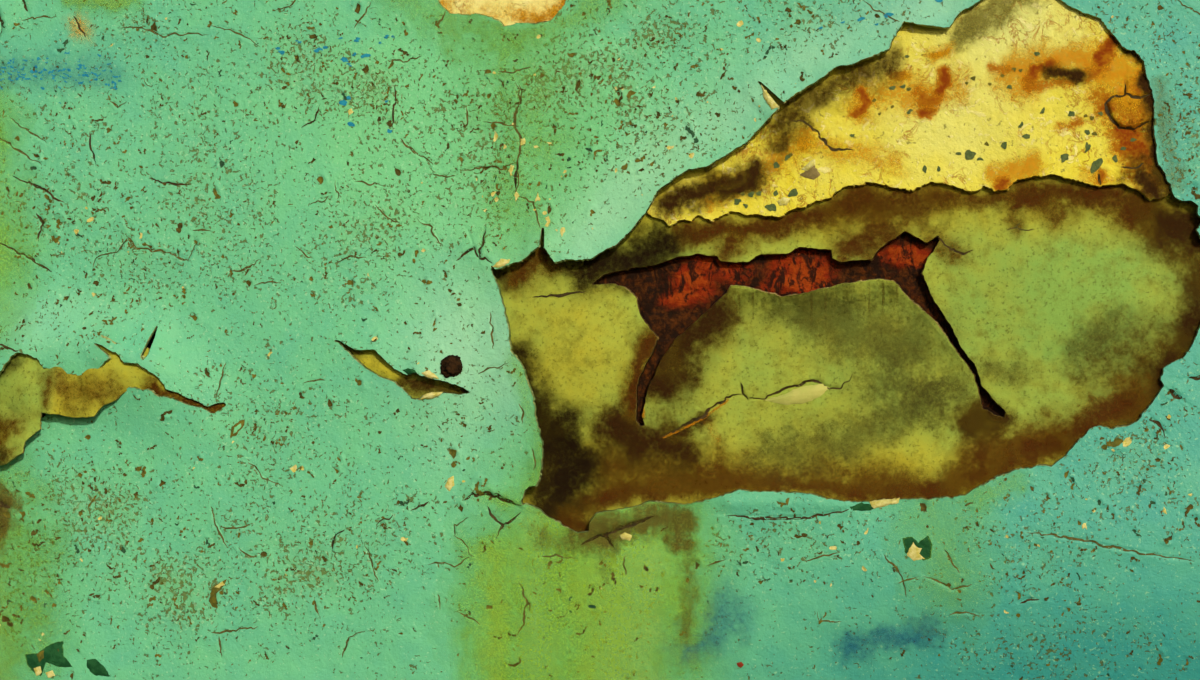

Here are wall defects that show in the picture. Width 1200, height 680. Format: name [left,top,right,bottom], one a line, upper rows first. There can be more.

peeling [126,0,343,168]
crack [391,56,540,227]
peeling [0,158,210,627]
crack [93,219,210,266]
peeling [293,216,485,334]
crack [309,181,492,263]
peeling [333,0,1200,635]
rust [488,0,1200,680]
crack [1149,375,1200,438]
peeling [107,501,271,642]
crack [429,491,521,568]
peeling [20,630,110,679]